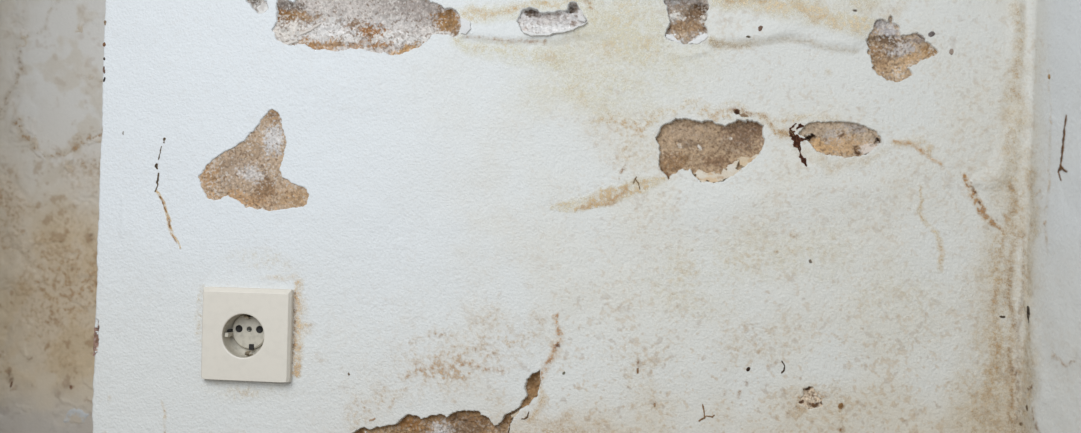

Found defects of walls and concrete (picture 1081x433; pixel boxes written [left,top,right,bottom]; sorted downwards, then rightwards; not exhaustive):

spalling [247,0,471,55]
spalling [518,3,588,37]
spalling [664,0,709,44]
spalling [866,16,954,82]
crack [154,137,166,192]
spalling [198,109,309,211]
spalling [656,113,764,183]
spalling [799,122,881,158]
crack [1057,115,1067,181]
leakage [408,348,486,380]
spalling [355,371,541,433]